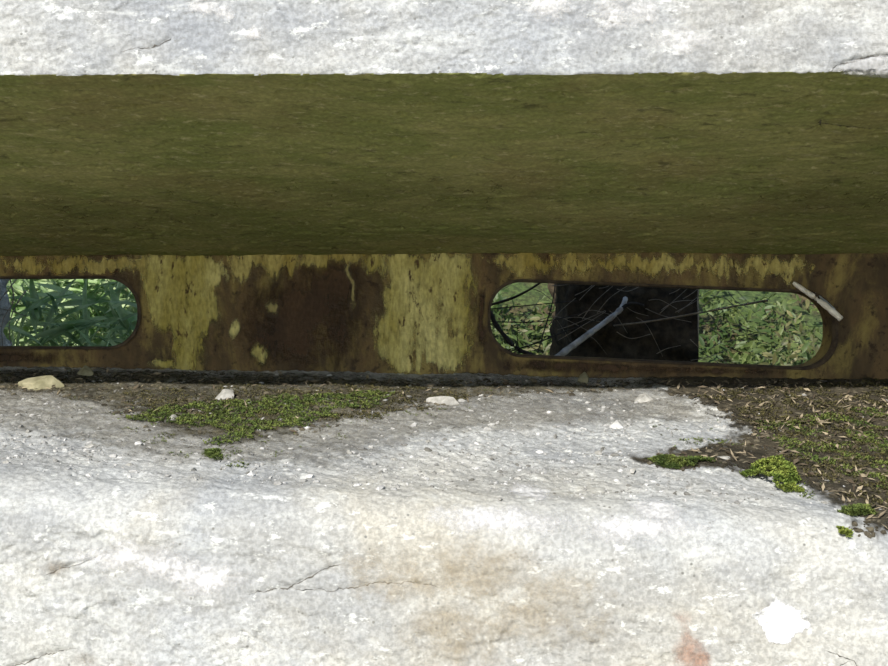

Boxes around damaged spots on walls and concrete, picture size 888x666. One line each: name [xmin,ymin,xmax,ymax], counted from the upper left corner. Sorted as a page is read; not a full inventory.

crack [834,55,888,68]
rust [244,258,359,370]
rust [508,360,772,374]
crack [255,564,433,593]